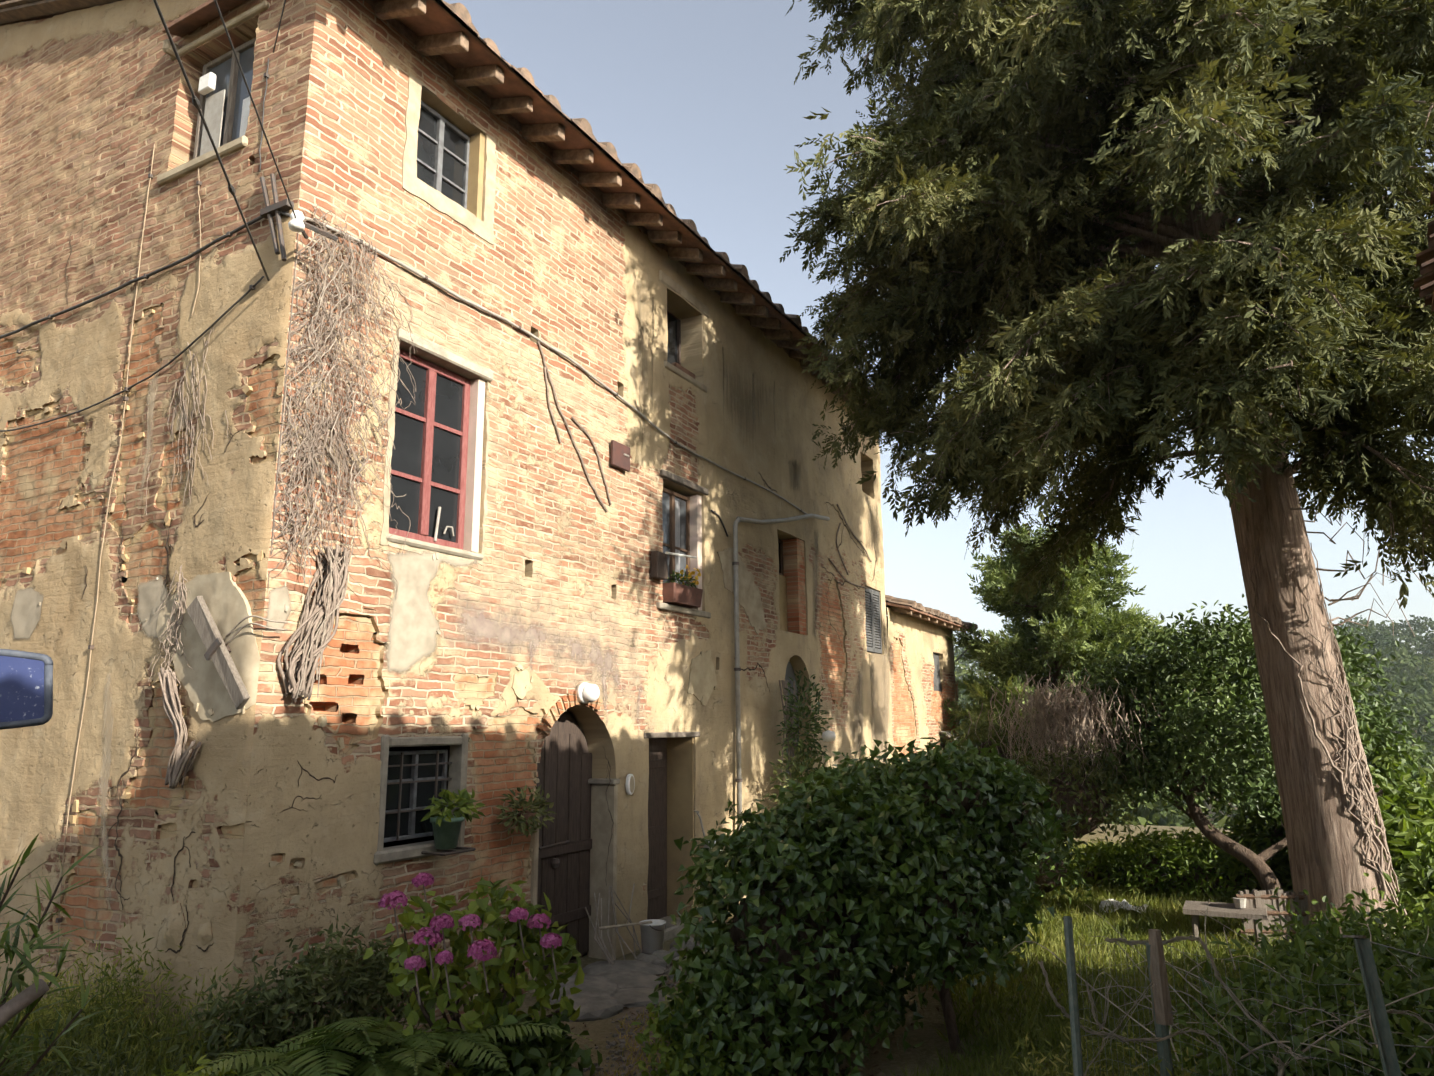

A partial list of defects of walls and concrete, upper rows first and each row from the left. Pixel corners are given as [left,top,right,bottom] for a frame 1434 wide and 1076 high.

flaking render [0,303,193,624]
flaking render [236,550,267,623]
flaking render [819,579,847,711]
flaking render [121,666,199,839]
crack [280,760,338,813]
flaking render [52,800,113,962]